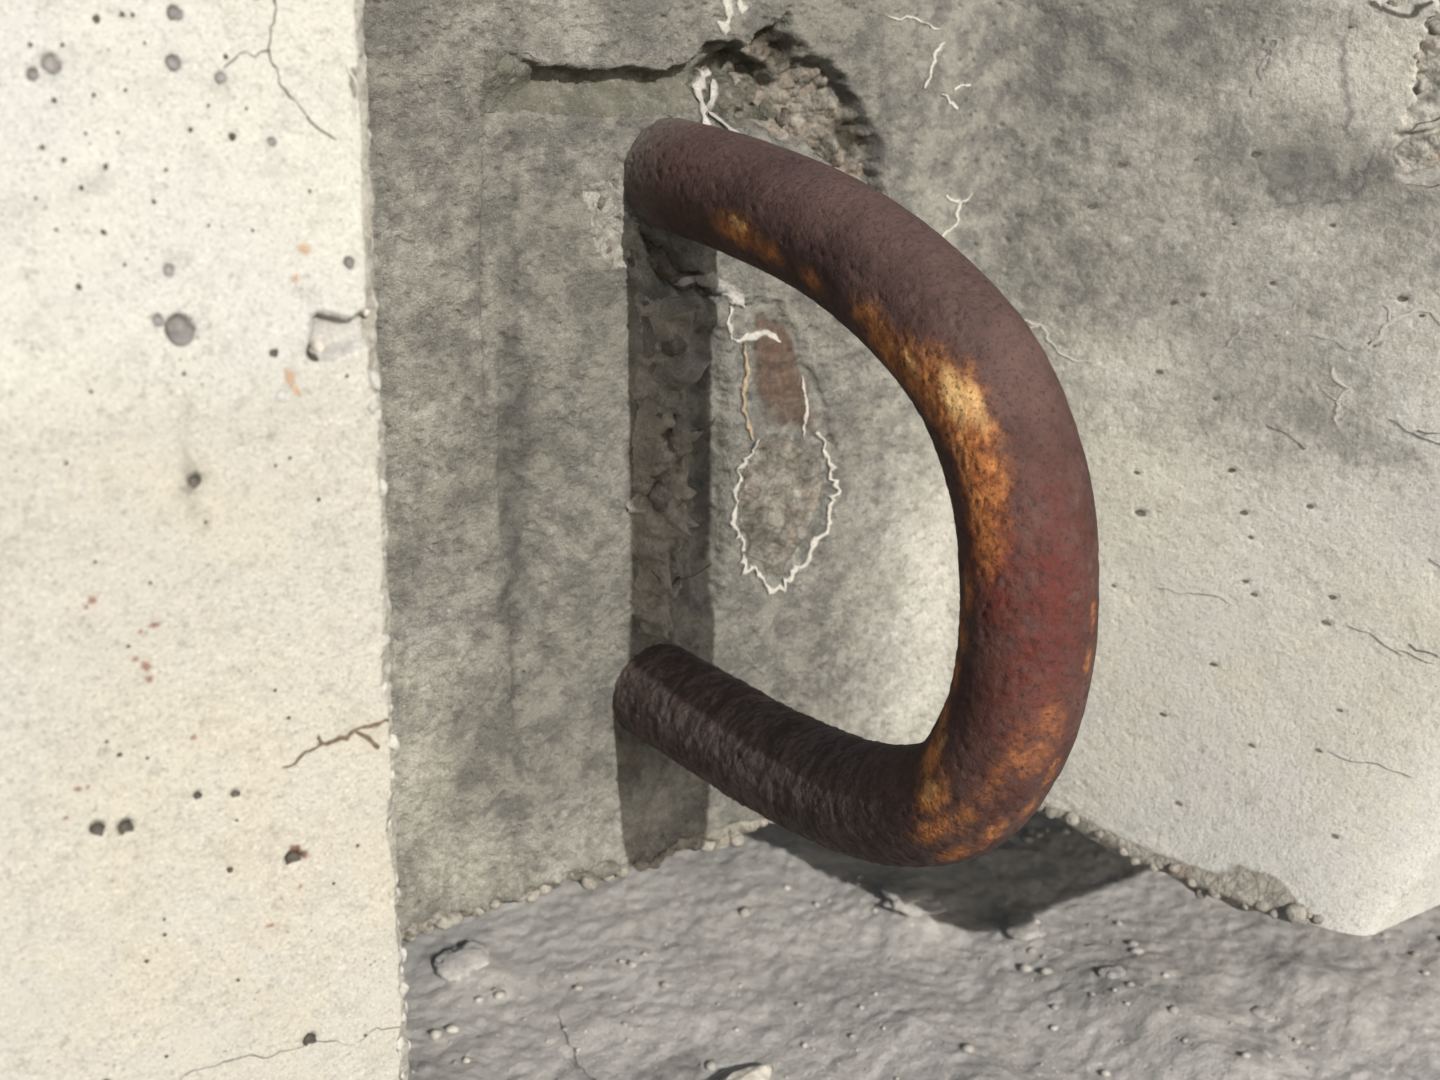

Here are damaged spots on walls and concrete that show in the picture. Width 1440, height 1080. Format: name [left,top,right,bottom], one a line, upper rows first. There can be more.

spalling [1368,0,1440,107]
spalling [479,28,865,182]
spalling [1394,132,1440,173]
spalling [581,174,745,307]
corrosion [742,316,812,440]
crack [1348,626,1440,664]
crack [284,719,389,768]
crack [181,1027,401,1079]
crack [558,1015,596,1080]